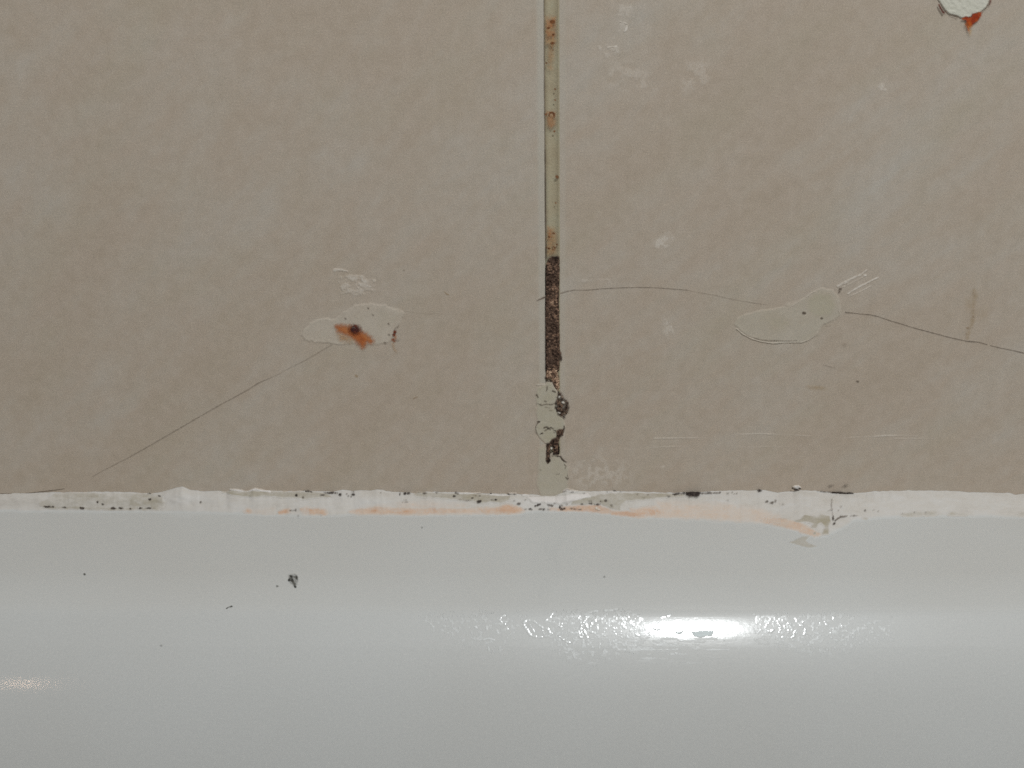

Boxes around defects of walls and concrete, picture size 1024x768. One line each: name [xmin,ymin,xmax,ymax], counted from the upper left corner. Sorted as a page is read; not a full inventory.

corrosion [962,0,991,31]
crack [536,286,769,306]
corrosion [335,325,372,348]
crack [844,311,1024,354]
crack [92,344,333,477]
damp [242,489,822,540]
peeling [788,514,831,549]